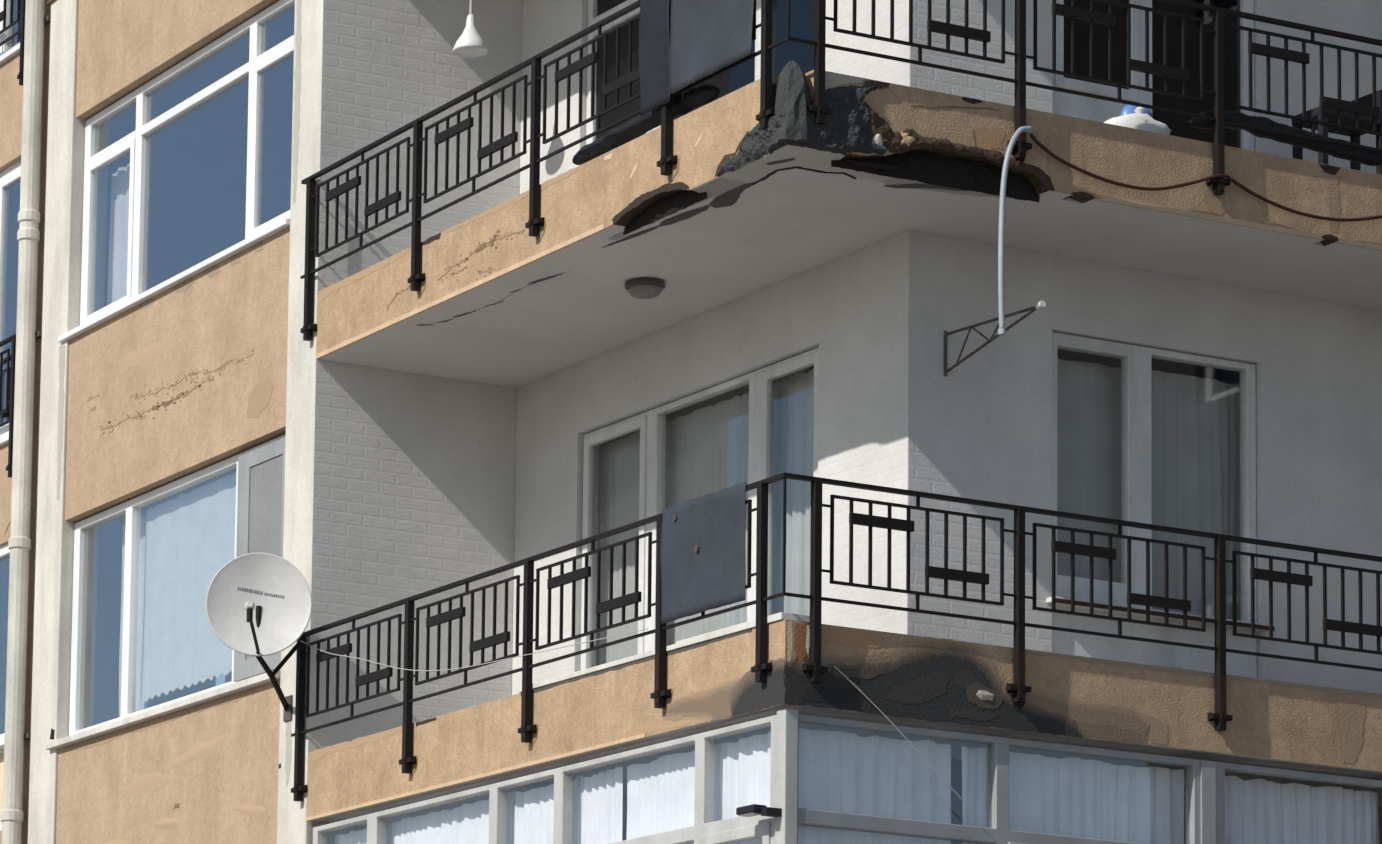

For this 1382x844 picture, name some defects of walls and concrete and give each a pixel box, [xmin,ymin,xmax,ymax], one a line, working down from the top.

spalling [715,131,749,176]
spalling [825,71,1096,203]
spalling [612,182,708,235]
crack [386,229,525,309]
crack [100,349,254,435]
water stain [625,637,1168,745]